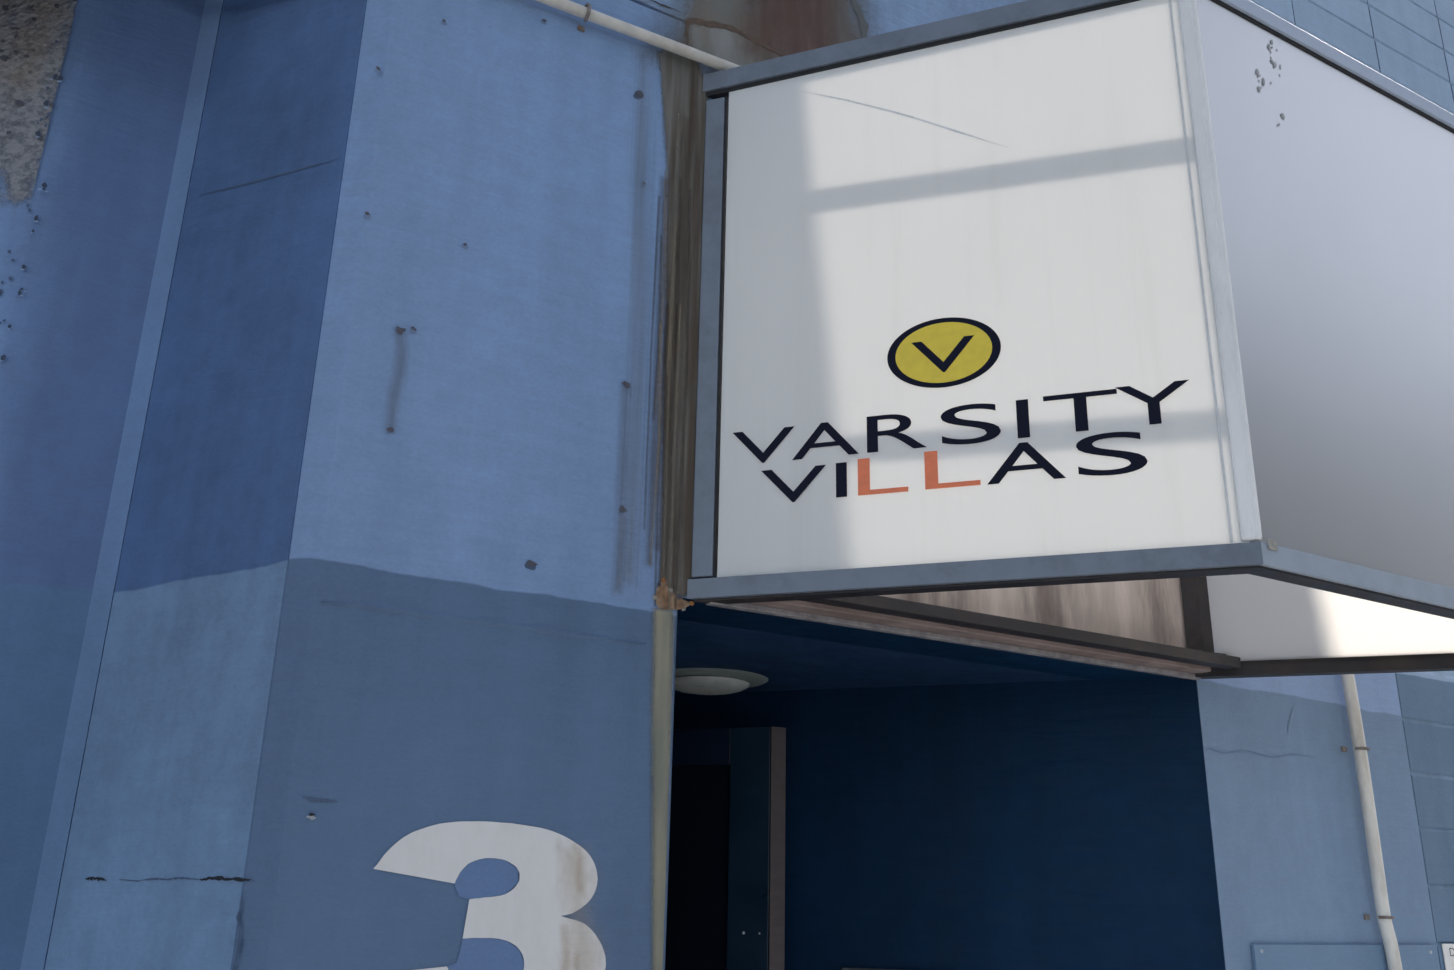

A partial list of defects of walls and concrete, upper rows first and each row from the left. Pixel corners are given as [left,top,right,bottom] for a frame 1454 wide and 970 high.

spalling [0,0,77,203]
crack [85,876,251,970]